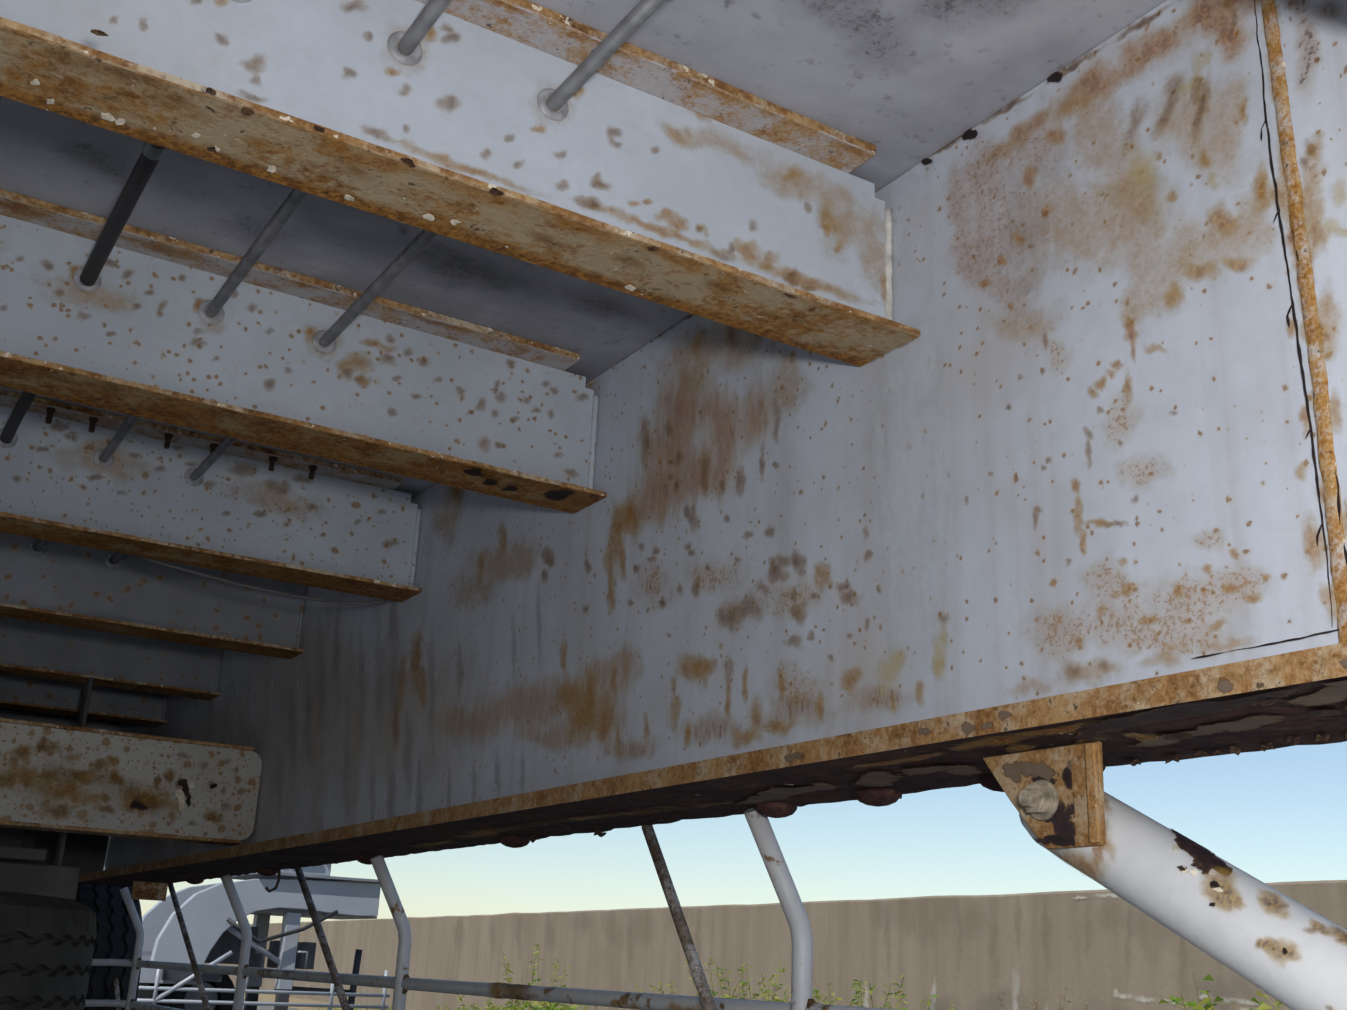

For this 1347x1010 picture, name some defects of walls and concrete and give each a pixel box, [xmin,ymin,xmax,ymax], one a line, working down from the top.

corrosion [1191,0,1254,58]
corrosion [993,11,1180,156]
corrosion [922,128,978,165]
corrosion [732,244,850,315]
crack [1192,0,1347,659]
corrosion [1027,549,1267,658]
peeling [961,710,1012,735]
peeling [1075,659,1347,766]
corrosion [0,737,191,820]
peeling [737,782,838,805]
peeling [854,765,982,799]
peeling [1003,760,1072,783]